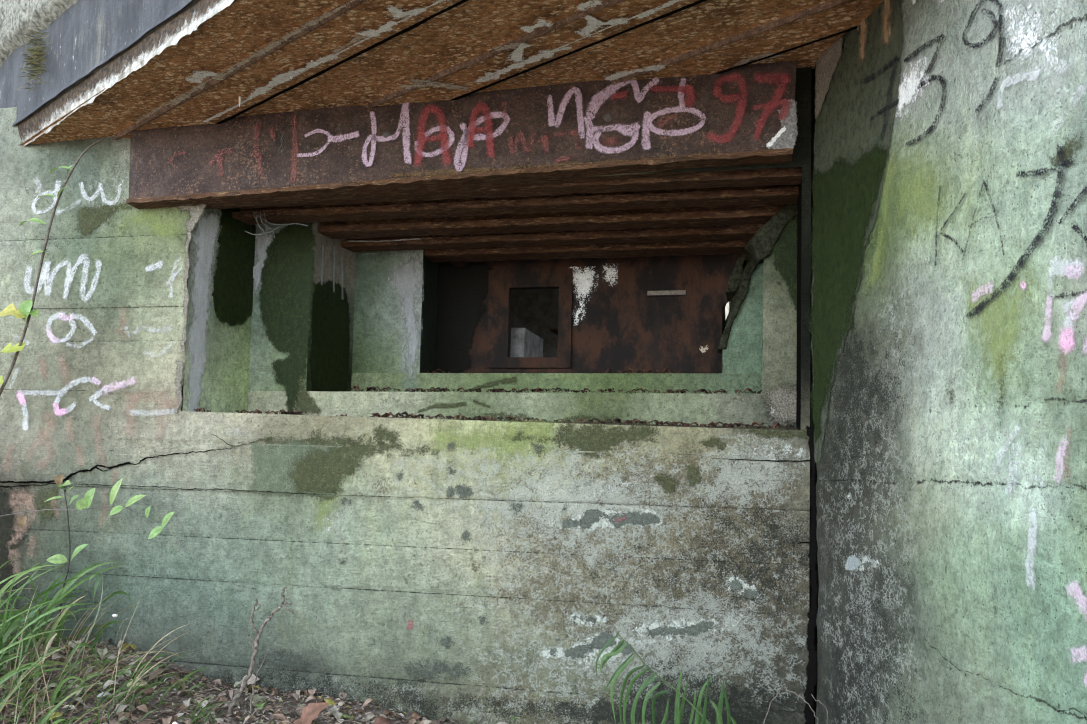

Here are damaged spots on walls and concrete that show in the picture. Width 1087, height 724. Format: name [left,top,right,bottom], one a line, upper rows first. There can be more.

peeling [135,0,355,123]
peeling [201,0,453,122]
peeling [400,0,683,91]
water stain [212,208,350,415]
crack [0,448,326,495]
water stain [251,425,439,534]
spalling [561,502,663,531]
crack [918,478,1087,492]
spalling [540,613,718,663]
crack [925,639,1087,720]